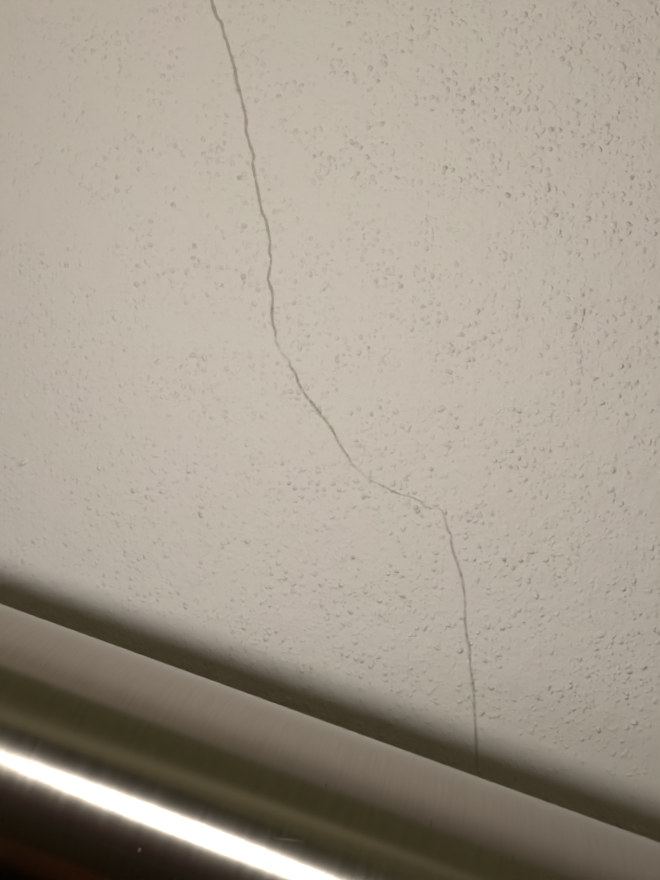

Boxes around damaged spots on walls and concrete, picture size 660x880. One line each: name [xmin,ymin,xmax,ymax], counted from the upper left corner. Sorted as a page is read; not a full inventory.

crack [211,0,275,330]